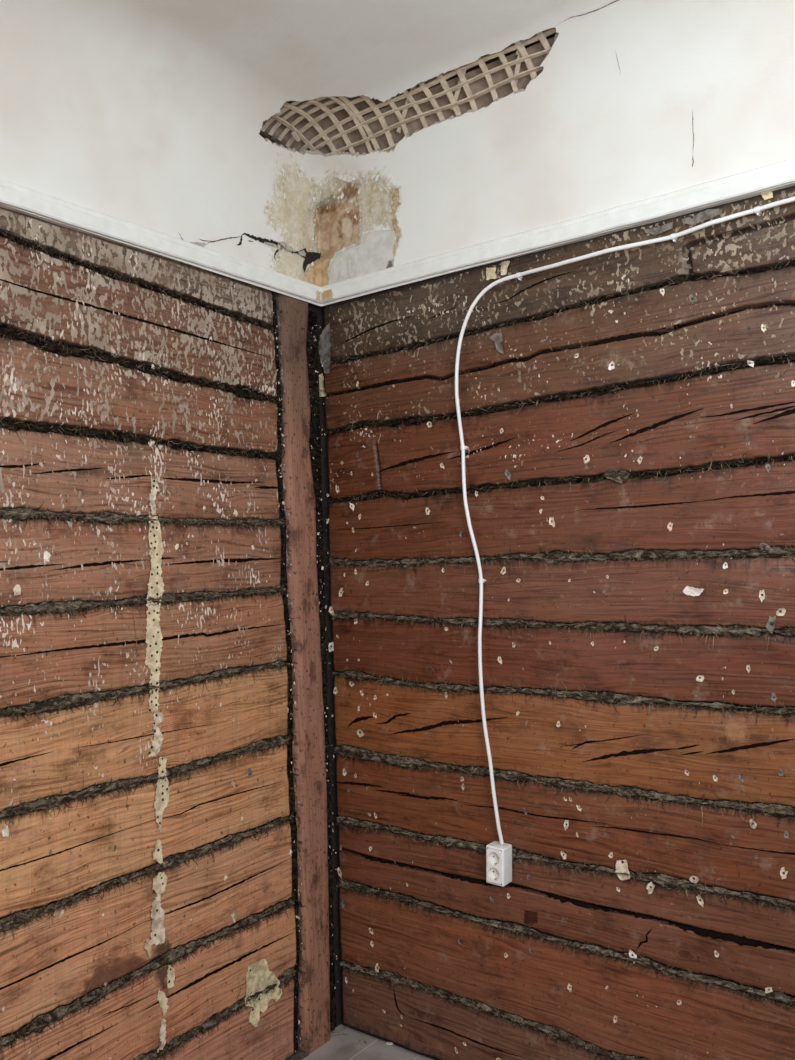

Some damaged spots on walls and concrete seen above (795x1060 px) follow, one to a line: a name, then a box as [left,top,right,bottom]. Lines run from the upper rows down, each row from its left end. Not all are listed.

spalling [259,27,559,157]
crack [180,195,333,272]
peeling [308,169,402,266]
crack [0,279,274,359]
peeling [0,209,277,516]
crack [381,437,517,471]
crack [554,402,795,453]
peeling [0,438,110,598]
crack [347,713,508,735]
crack [560,733,794,762]
crack [347,849,795,952]